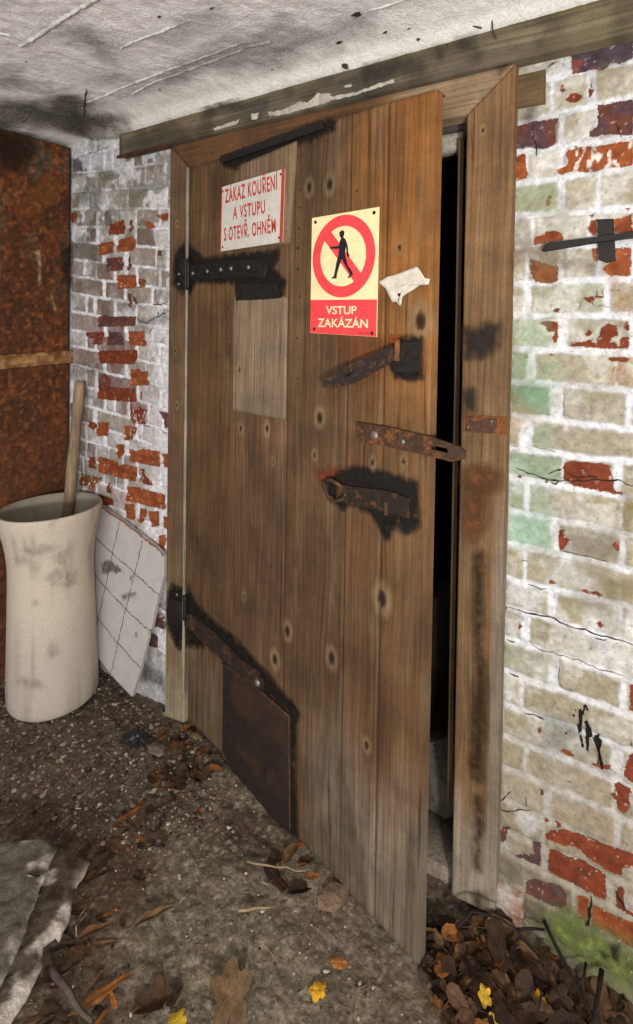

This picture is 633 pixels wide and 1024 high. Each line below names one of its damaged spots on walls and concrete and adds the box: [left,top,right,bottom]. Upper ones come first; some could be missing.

damp [0,96,128,138]
peeling [516,117,560,181]
peeling [548,41,633,175]
peeling [586,212,632,277]
rust [0,129,73,509]
peeling [570,322,630,373]
peeling [79,213,168,549]
crack [510,445,631,486]
peeling [562,460,623,495]
crack [505,561,632,645]
crack [507,639,632,692]
peeling [515,815,633,973]